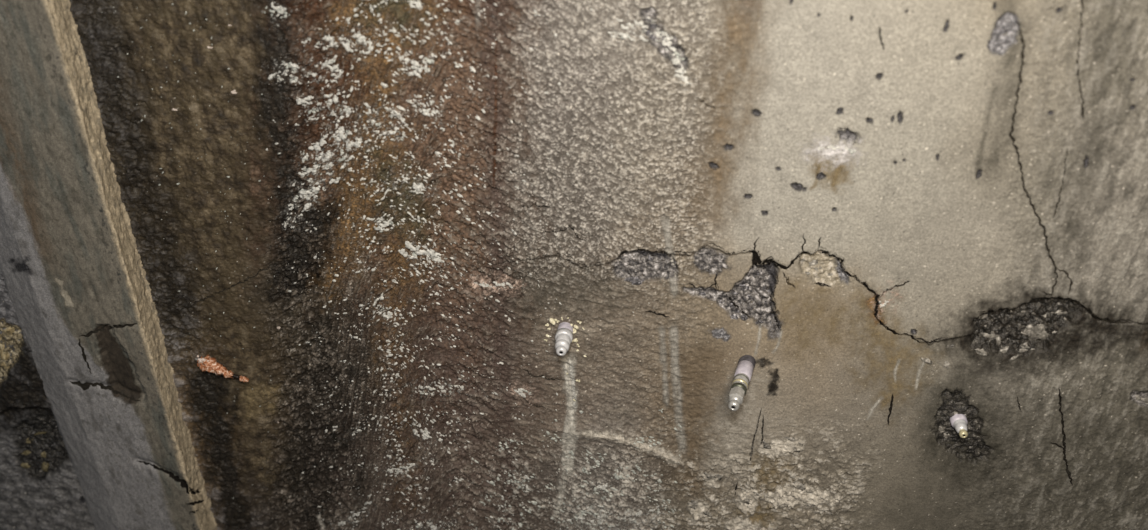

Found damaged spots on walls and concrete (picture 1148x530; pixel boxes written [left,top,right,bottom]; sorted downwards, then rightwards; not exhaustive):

damp [401,50,434,78]
damp [258,0,406,301]
damp [376,173,434,197]
crack [978,0,1148,325]
spalling [0,319,24,383]
efflorescence [398,241,448,270]
spalling [612,247,779,341]
crack [498,201,943,343]
spalling [972,297,1081,361]
damp [279,311,376,530]
spalling [933,389,993,462]
crack [1052,389,1073,485]